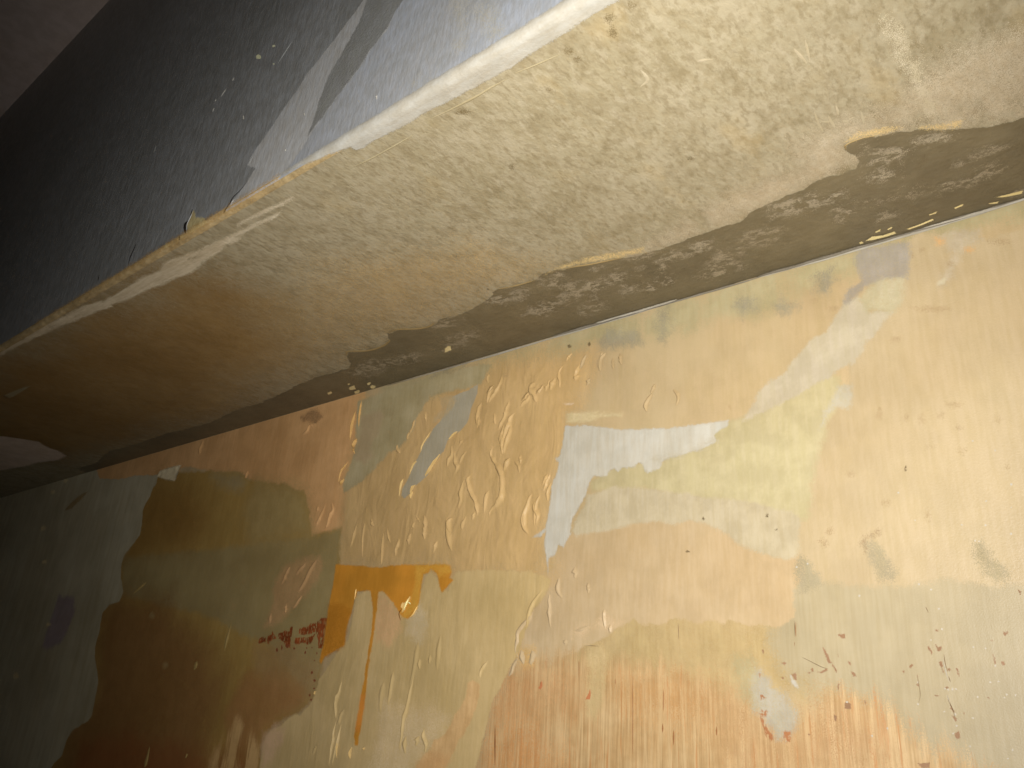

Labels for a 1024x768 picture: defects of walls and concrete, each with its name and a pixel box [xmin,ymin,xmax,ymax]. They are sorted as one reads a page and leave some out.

leakage [844,126,903,143]
flaking render [77,118,1024,499]
leakage [379,201,1024,392]